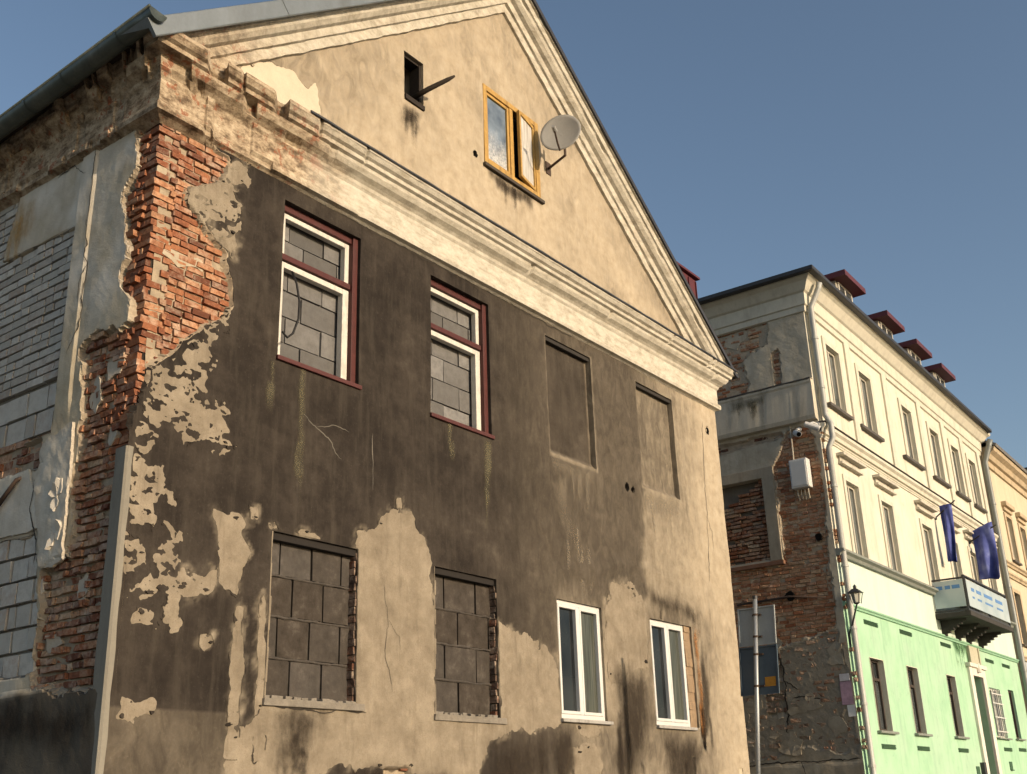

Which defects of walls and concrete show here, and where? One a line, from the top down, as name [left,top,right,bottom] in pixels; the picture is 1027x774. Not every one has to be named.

flaking render [241,61,321,115]
crack [58,150,96,353]
flaking render [0,123,562,774]
crack [304,414,347,457]
spalling [717,322,781,400]
spalling [718,426,847,652]